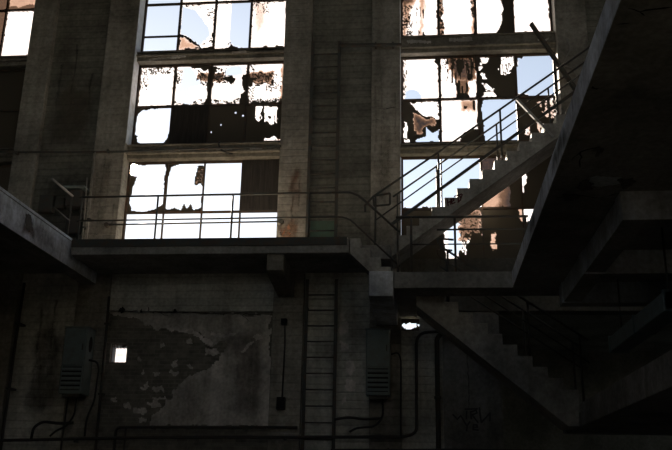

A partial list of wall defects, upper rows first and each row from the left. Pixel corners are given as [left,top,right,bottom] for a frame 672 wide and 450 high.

flaking render [110,305,272,426]